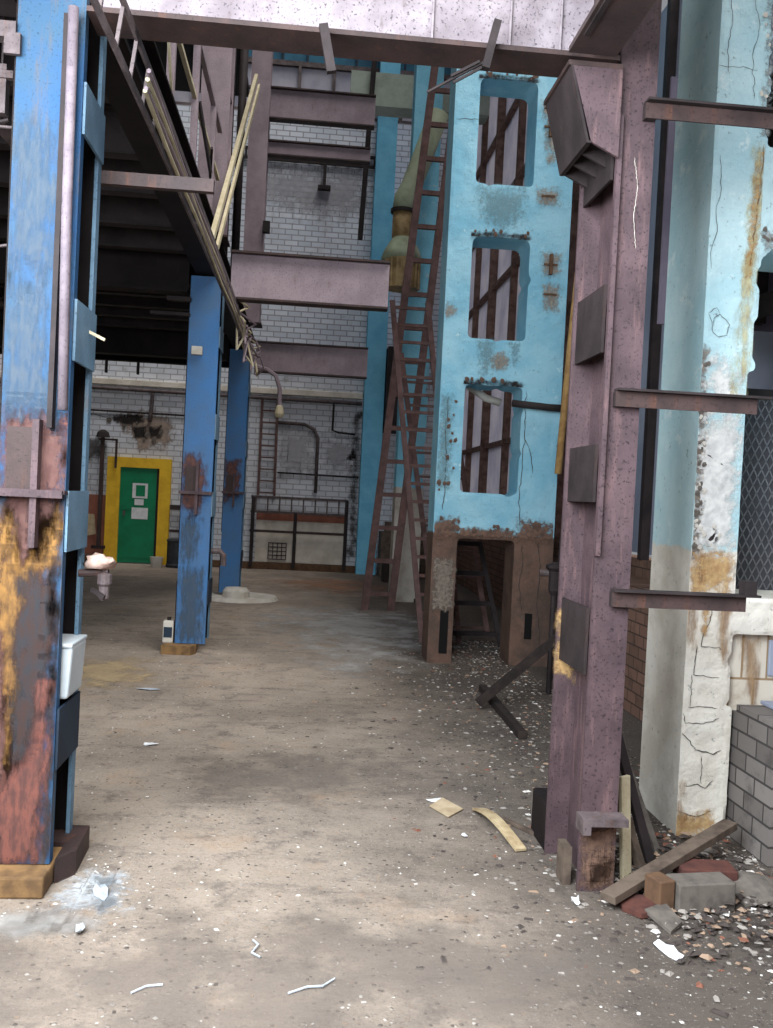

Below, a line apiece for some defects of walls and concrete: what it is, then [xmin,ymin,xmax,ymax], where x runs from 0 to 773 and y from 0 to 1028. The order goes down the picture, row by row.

rust [731,149,765,393]
spalling [106,413,163,443]
rust [179,454,207,641]
rust [223,459,241,501]
peeling [434,516,553,544]
peeling [691,411,743,559]
peeling [700,348,742,395]
rust [0,411,68,864]
crack [682,615,722,817]
rust [676,807,714,836]